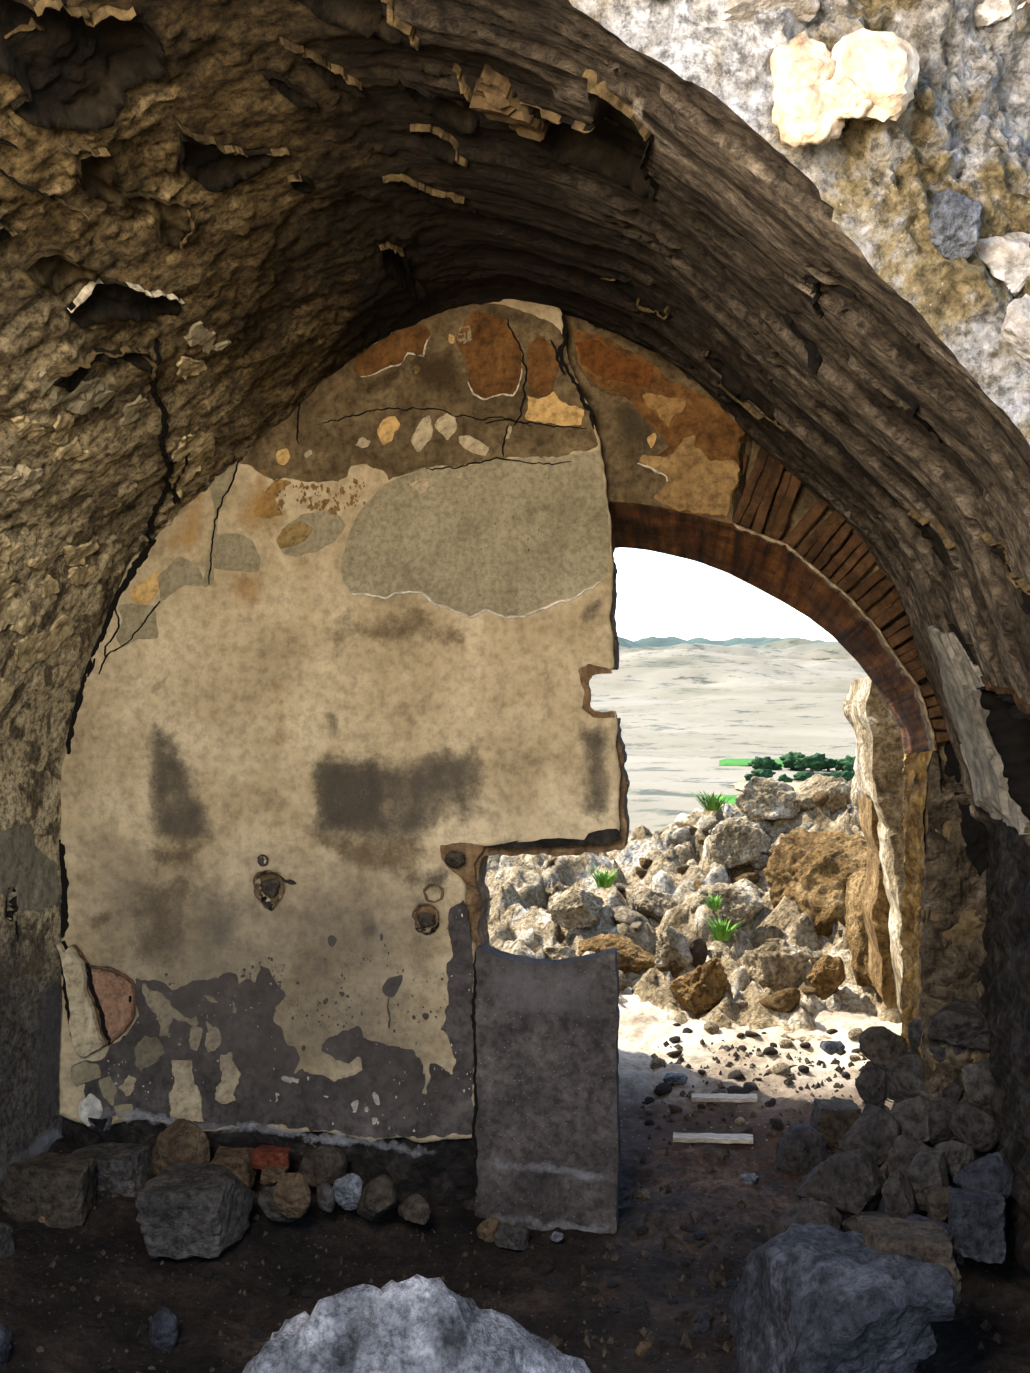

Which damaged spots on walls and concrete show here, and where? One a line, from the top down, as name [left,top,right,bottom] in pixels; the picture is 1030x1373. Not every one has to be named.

flaking render [0,0,195,251]
flaking render [452,63,689,201]
crack [66,338,190,754]
crack [208,458,243,584]
crack [296,312,595,470]
flaking render [116,303,786,647]
crack [59,840,71,1036]
water stain [151,730,207,864]
flaking render [56,884,474,1139]
water stain [317,753,478,884]
flaking render [440,829,620,886]
flaking render [928,625,1030,876]